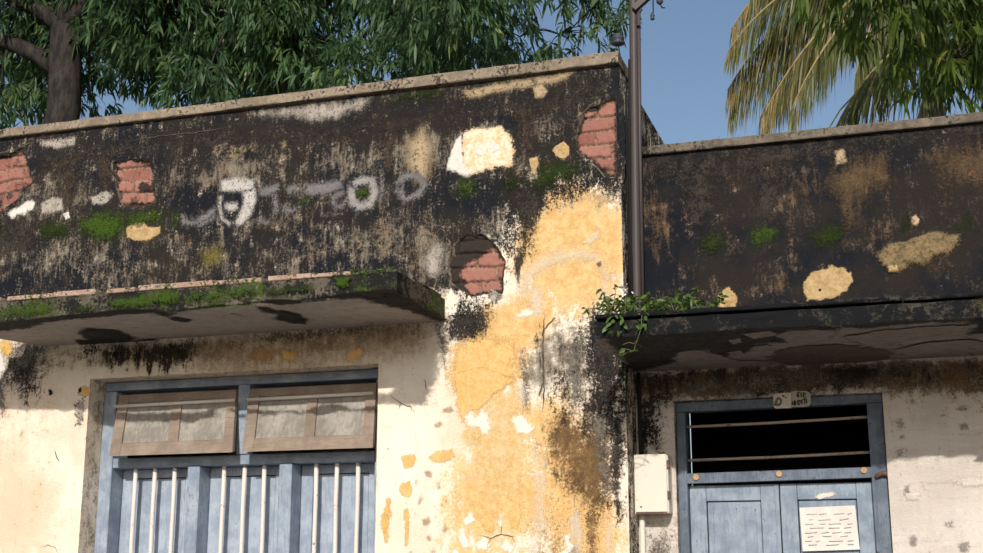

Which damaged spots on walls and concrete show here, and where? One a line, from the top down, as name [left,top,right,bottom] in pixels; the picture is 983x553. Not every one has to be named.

flaking render [0,135,77,220]
flaking render [89,154,161,242]
flaking render [246,94,374,123]
flaking render [446,125,515,178]
flaking render [552,92,626,183]
water stain [0,288,395,331]
flaking render [420,229,613,319]
flaking render [803,265,853,301]
water stain [0,342,42,417]
water stain [91,338,199,375]
water stain [517,348,535,411]
water stain [527,302,917,553]